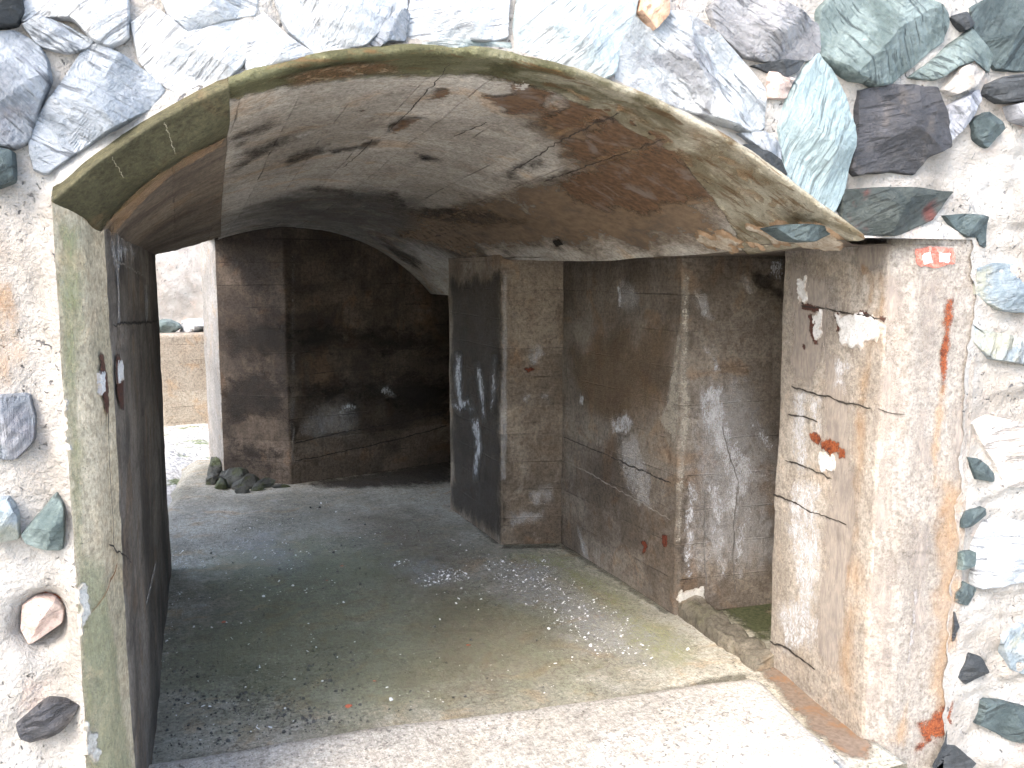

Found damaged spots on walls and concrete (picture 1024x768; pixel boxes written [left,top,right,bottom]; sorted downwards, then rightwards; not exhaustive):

damp [285,142,378,164]
damp [379,112,719,267]
spalling [796,275,809,304]
spalling [812,309,885,352]
corrosion [940,298,954,393]
peeling [97,360,124,396]
crack [788,386,906,422]
corrosion [809,432,845,459]
crack [785,460,831,479]
crack [722,426,739,591]
crack [773,493,846,525]
corrosion [916,703,953,751]